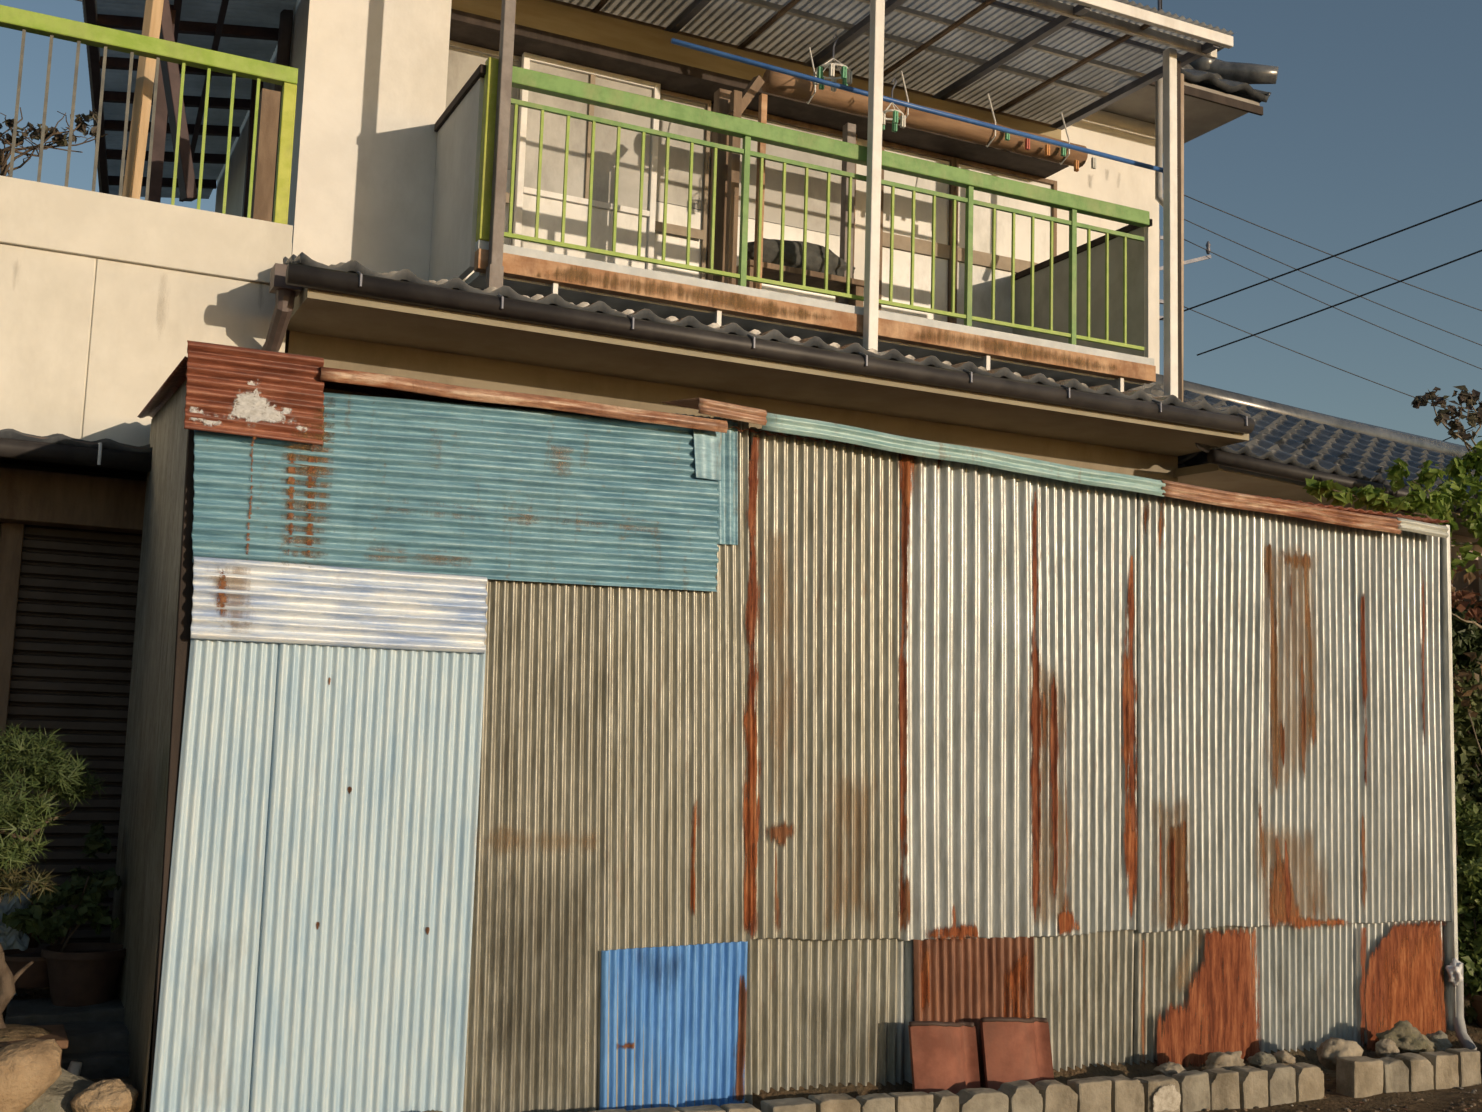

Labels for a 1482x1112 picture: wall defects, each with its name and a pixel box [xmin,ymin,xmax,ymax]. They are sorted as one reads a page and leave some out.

peeling [190,381,307,431]
rust [743,436,794,937]
rust [898,453,914,931]
rust [1030,492,1079,935]
rust [1123,556,1138,917]
rust [1264,544,1316,785]
rust [1360,594,1368,784]
rust [921,905,978,1013]
rust [1003,954,1032,1018]
rust [1141,804,1344,1068]
rust [1360,921,1447,1052]